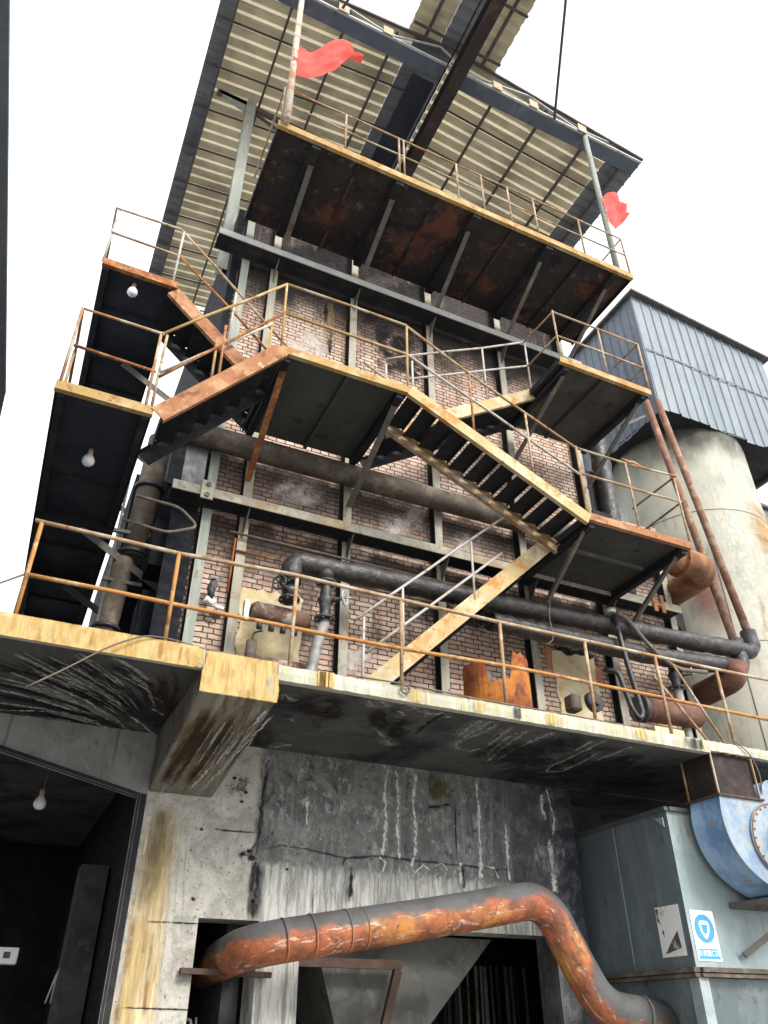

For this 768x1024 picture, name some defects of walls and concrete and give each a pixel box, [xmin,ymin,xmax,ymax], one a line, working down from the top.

crack [217,762,511,892]